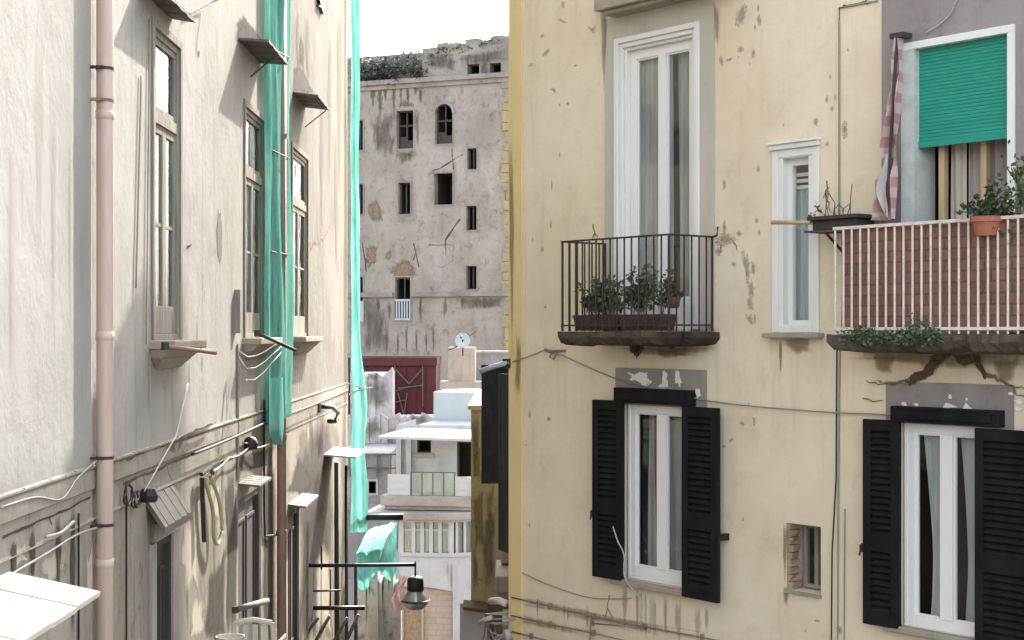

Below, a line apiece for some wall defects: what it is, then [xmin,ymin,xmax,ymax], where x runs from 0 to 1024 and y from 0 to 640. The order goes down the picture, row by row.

leakage [371,88,422,109]
leakage [375,122,389,147]
flaking render [368,203,381,220]
flaking render [366,246,416,279]
flaking render [715,220,756,325]
leakage [364,302,434,350]
crack [863,380,907,402]
crack [985,373,1024,397]